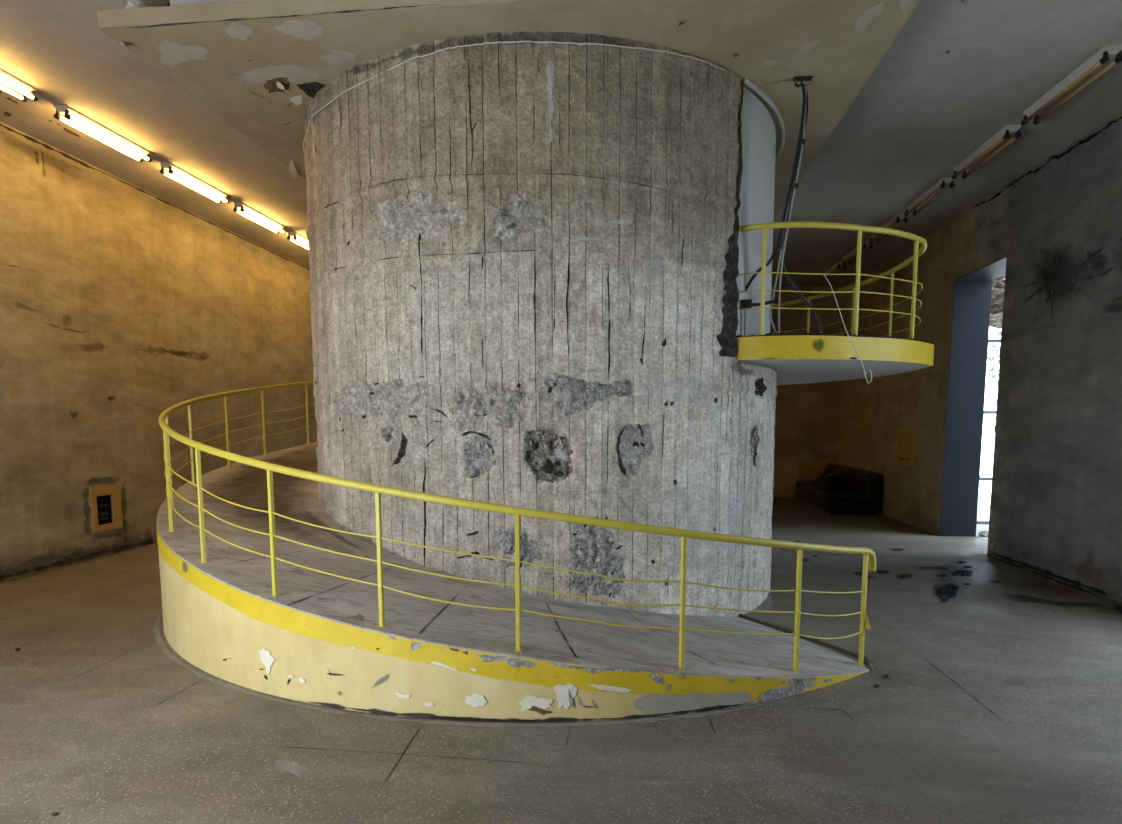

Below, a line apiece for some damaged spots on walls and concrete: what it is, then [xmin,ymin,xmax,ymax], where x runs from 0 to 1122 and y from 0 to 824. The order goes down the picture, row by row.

spalling [716,80,744,357]
spalling [539,372,633,416]
spalling [330,376,573,484]
spalling [616,423,654,478]
spalling [567,510,626,598]
peeling [259,648,275,675]
peeling [430,648,832,715]